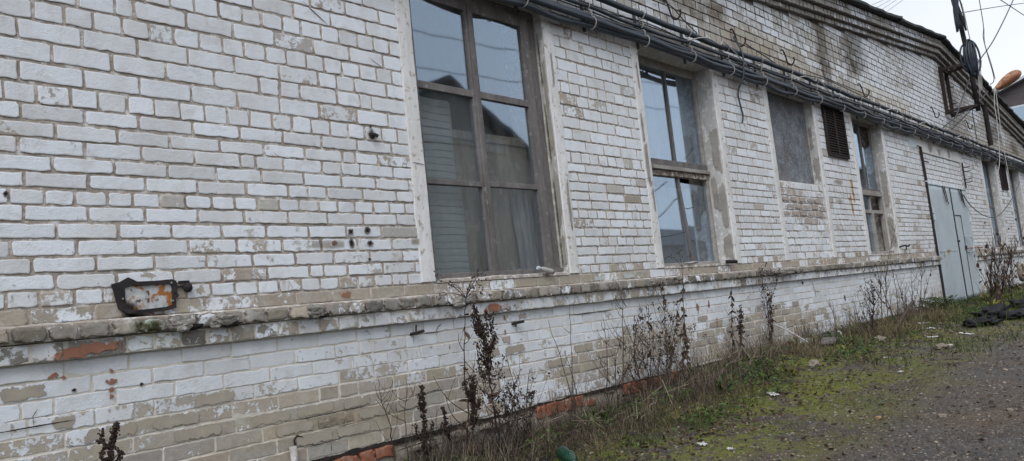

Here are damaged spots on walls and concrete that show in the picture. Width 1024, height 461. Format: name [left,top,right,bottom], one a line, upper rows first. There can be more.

spalling [772,268,799,276]
spalling [307,304,330,318]
spalling [166,312,242,332]
peeling [483,303,526,356]
peeling [696,300,736,346]
peeling [548,337,626,376]
peeling [0,340,122,403]
peeling [52,415,75,429]
peeling [152,390,235,442]
peeling [84,423,138,444]
flaking render [333,445,395,461]